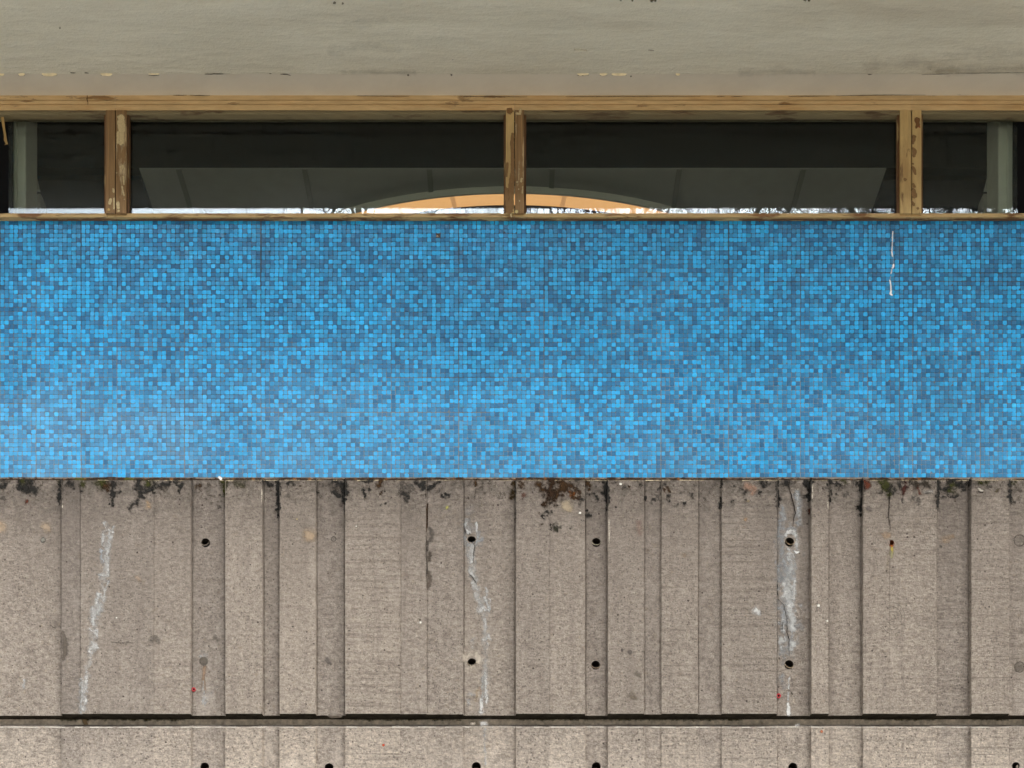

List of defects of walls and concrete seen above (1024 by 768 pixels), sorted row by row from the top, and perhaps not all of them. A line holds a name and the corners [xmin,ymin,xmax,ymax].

leakage [1,479,39,503]
leakage [57,479,117,507]
leakage [129,479,202,512]
leakage [742,478,841,651]
leakage [79,523,114,713]
leakage [392,522,493,730]
leakage [741,677,823,728]